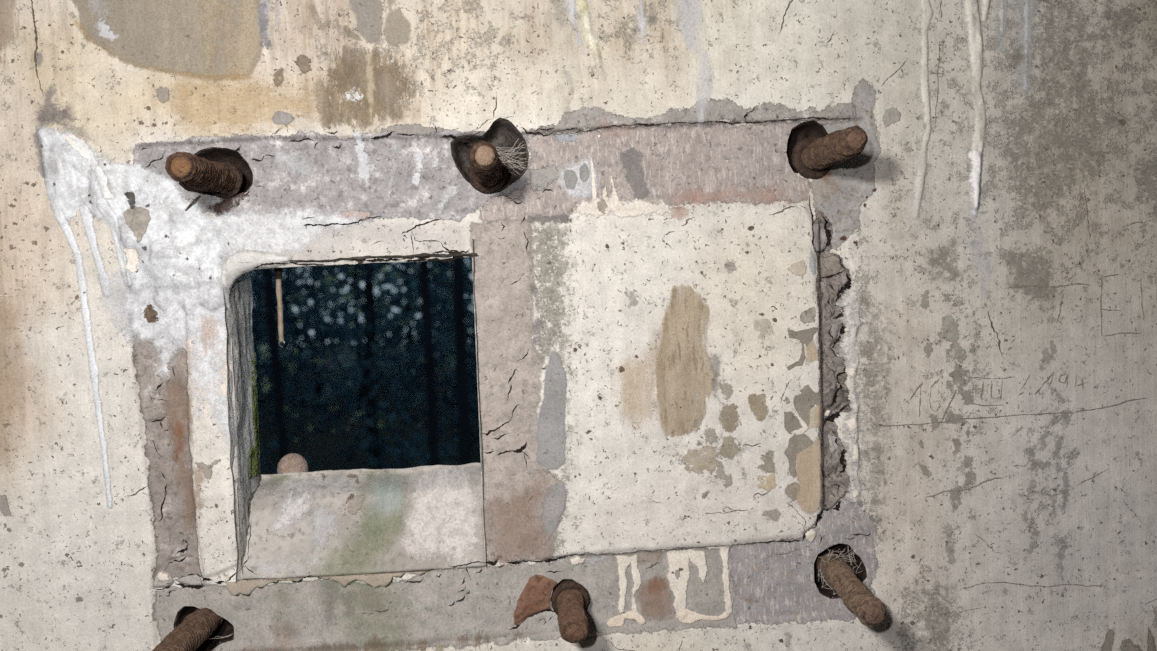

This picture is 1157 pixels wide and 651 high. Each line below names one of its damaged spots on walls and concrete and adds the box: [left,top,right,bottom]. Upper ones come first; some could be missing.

flaking render [123,192,151,274]
leakage [36,87,367,508]
spalling [132,78,901,651]
crack [235,93,850,194]
leakage [914,0,933,218]
rust [514,575,557,625]